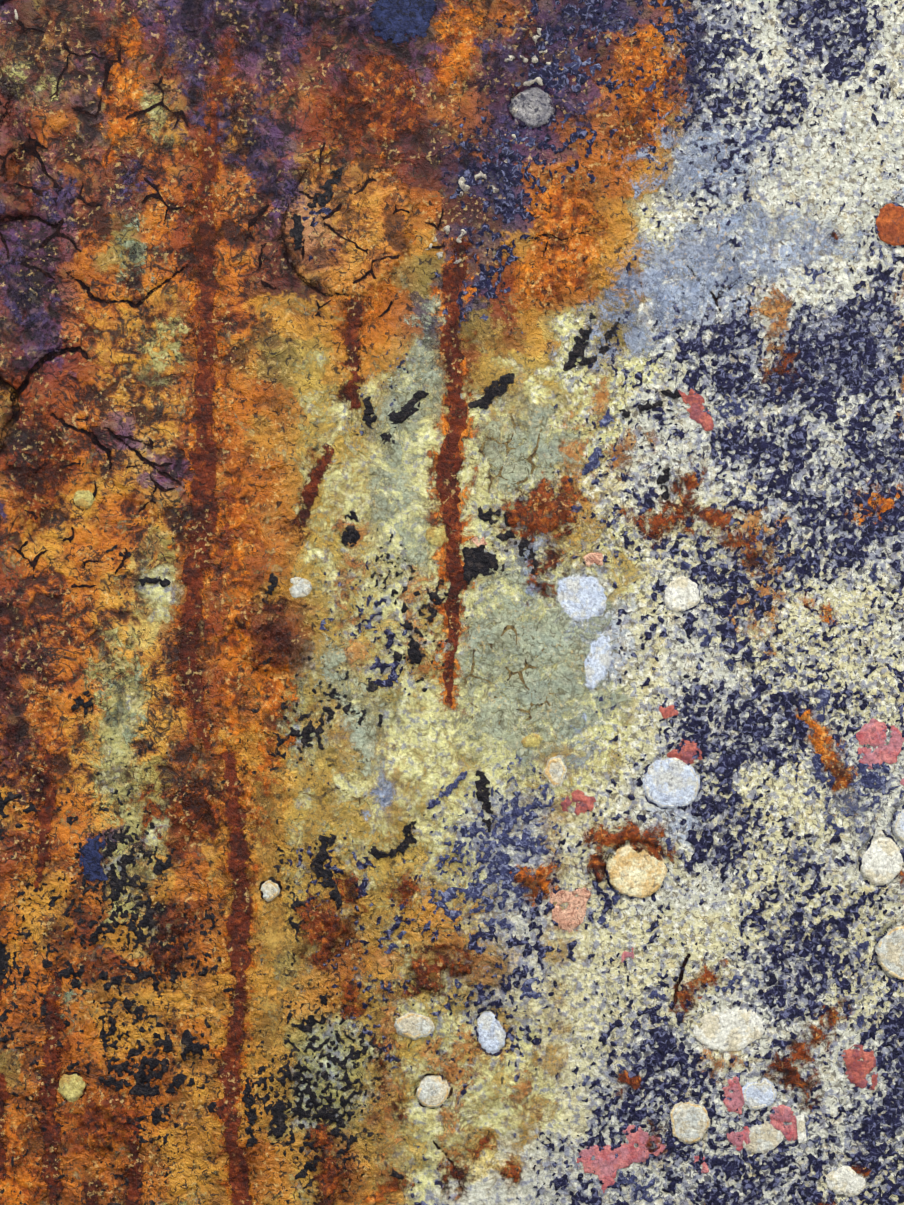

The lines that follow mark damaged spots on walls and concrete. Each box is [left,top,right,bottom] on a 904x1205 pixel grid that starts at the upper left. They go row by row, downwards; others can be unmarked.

crack [16,20,189,129]
crack [0,97,188,308]
crack [0,346,89,453]
crack [25,413,185,513]
crack [11,510,129,588]
corrosion [0,0,708,1205]
corrosion [700,1049,743,1084]